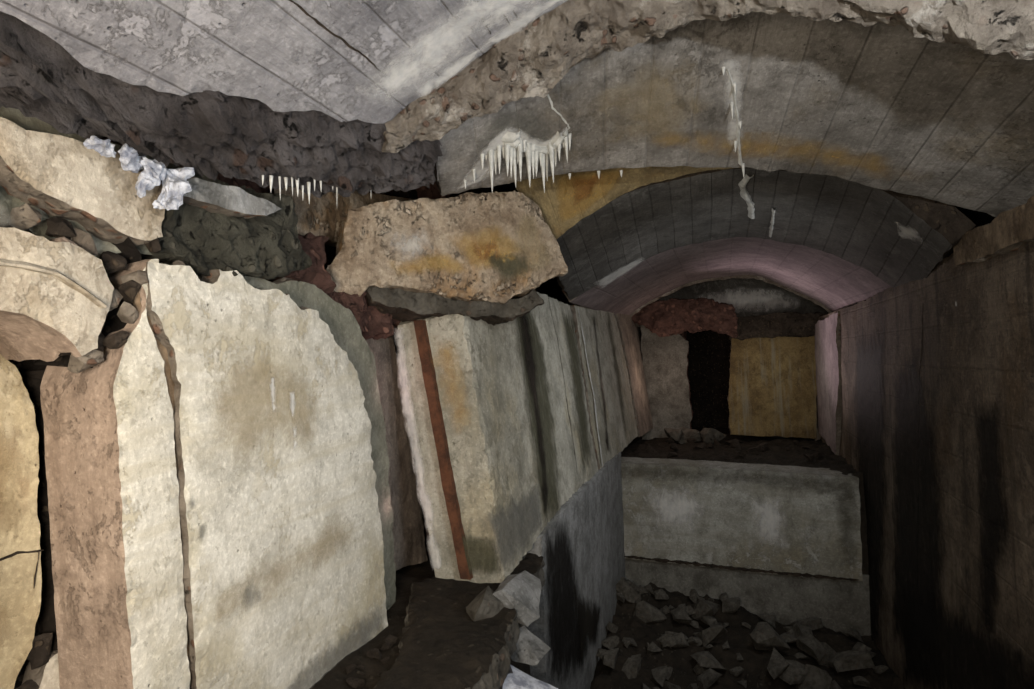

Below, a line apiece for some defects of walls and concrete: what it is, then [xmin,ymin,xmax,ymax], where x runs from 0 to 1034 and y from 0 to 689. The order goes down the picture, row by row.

damp [262,175,338,204]
damp [461,115,572,193]
efflorescence [721,62,755,219]
crack [0,203,209,689]
corrosion [413,320,498,580]
damp [657,493,698,521]
damp [756,503,780,539]
damp [855,333,1034,689]